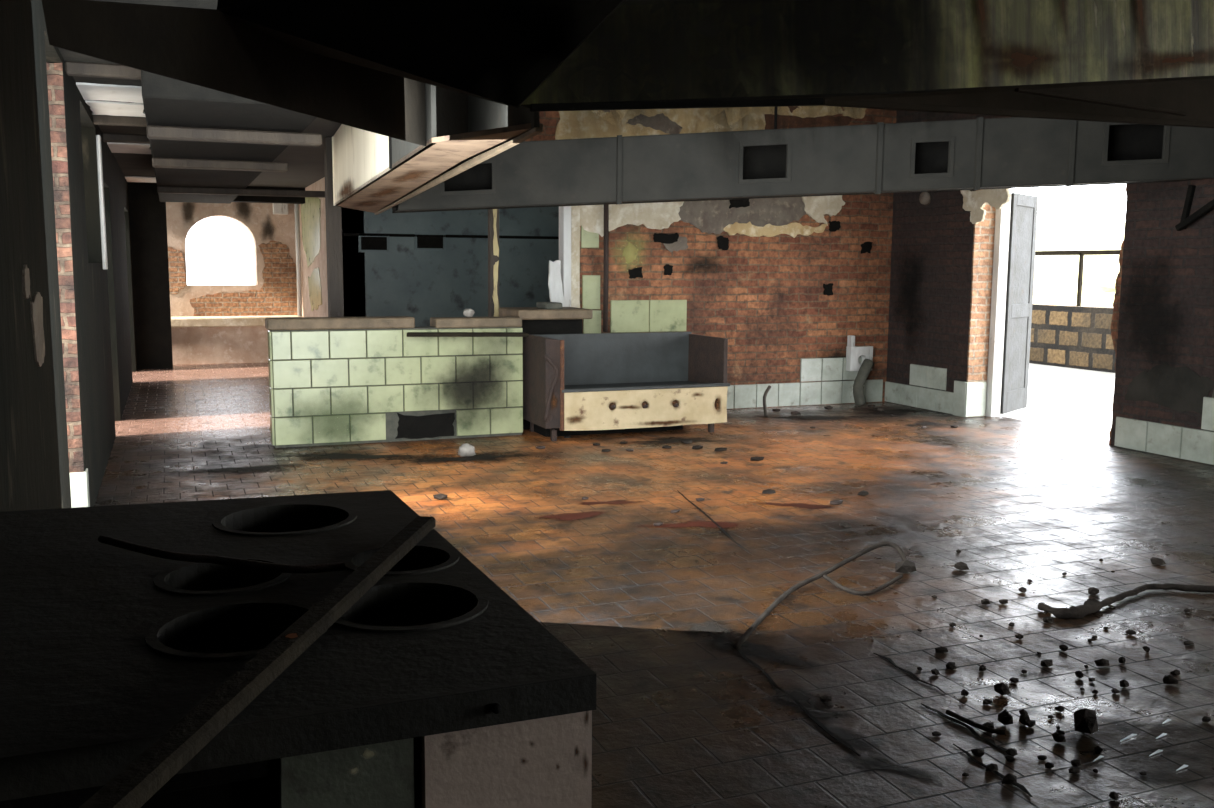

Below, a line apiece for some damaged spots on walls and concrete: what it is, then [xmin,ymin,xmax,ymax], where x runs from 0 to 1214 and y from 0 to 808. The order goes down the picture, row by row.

corrosion [975,0,1055,85]
corrosion [1133,0,1214,74]
peeling [572,195,845,308]
peeling [22,264,45,367]